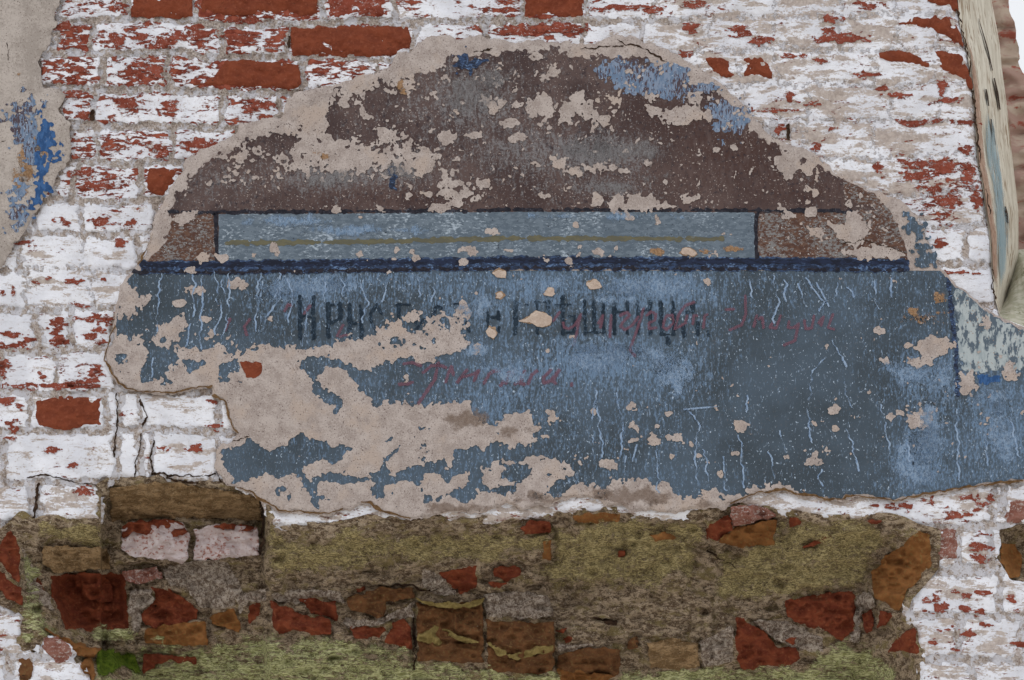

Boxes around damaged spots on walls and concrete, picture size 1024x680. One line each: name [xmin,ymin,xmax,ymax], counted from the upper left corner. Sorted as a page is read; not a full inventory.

peeling [71,169,119,192]
peeling [86,214,138,248]
peeling [124,54,630,214]
peeling [464,51,720,153]
peeling [577,178,713,225]
peeling [706,25,828,79]
peeling [677,141,912,263]
peeling [812,14,871,44]
peeling [879,0,998,285]
crack [27,474,97,518]
crack [104,324,411,556]
spalling [0,252,1024,680]